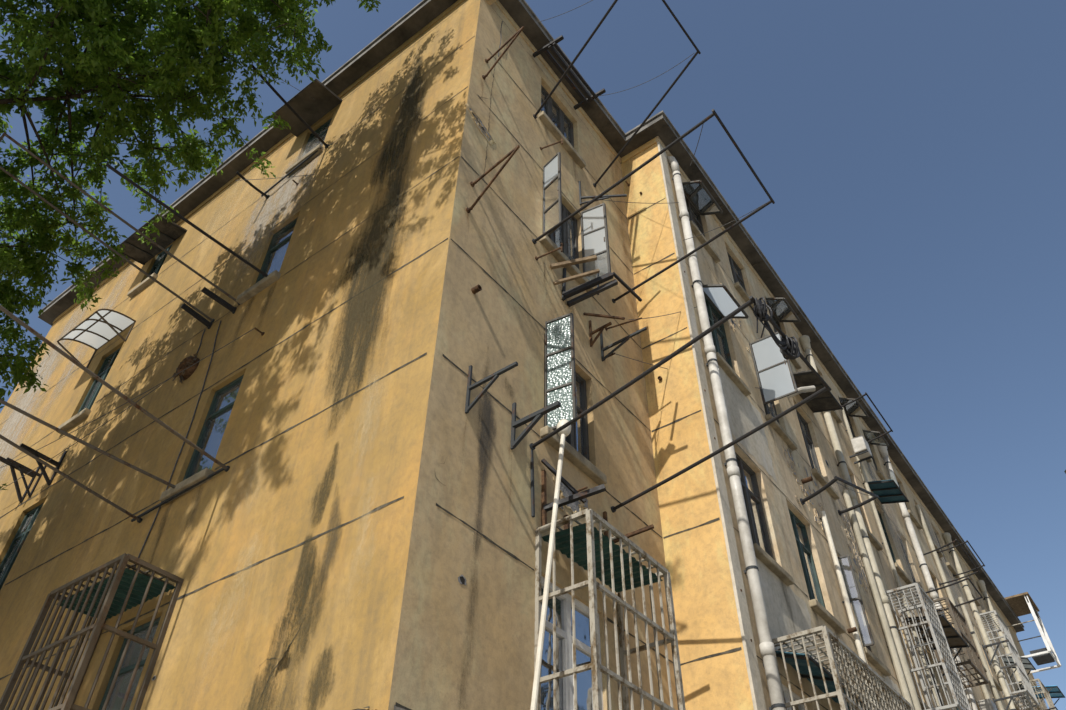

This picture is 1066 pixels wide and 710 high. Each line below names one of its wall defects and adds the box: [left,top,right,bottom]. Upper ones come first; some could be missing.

damp [328,58,425,426]
damp [248,445,340,710]
damp [477,395,494,533]